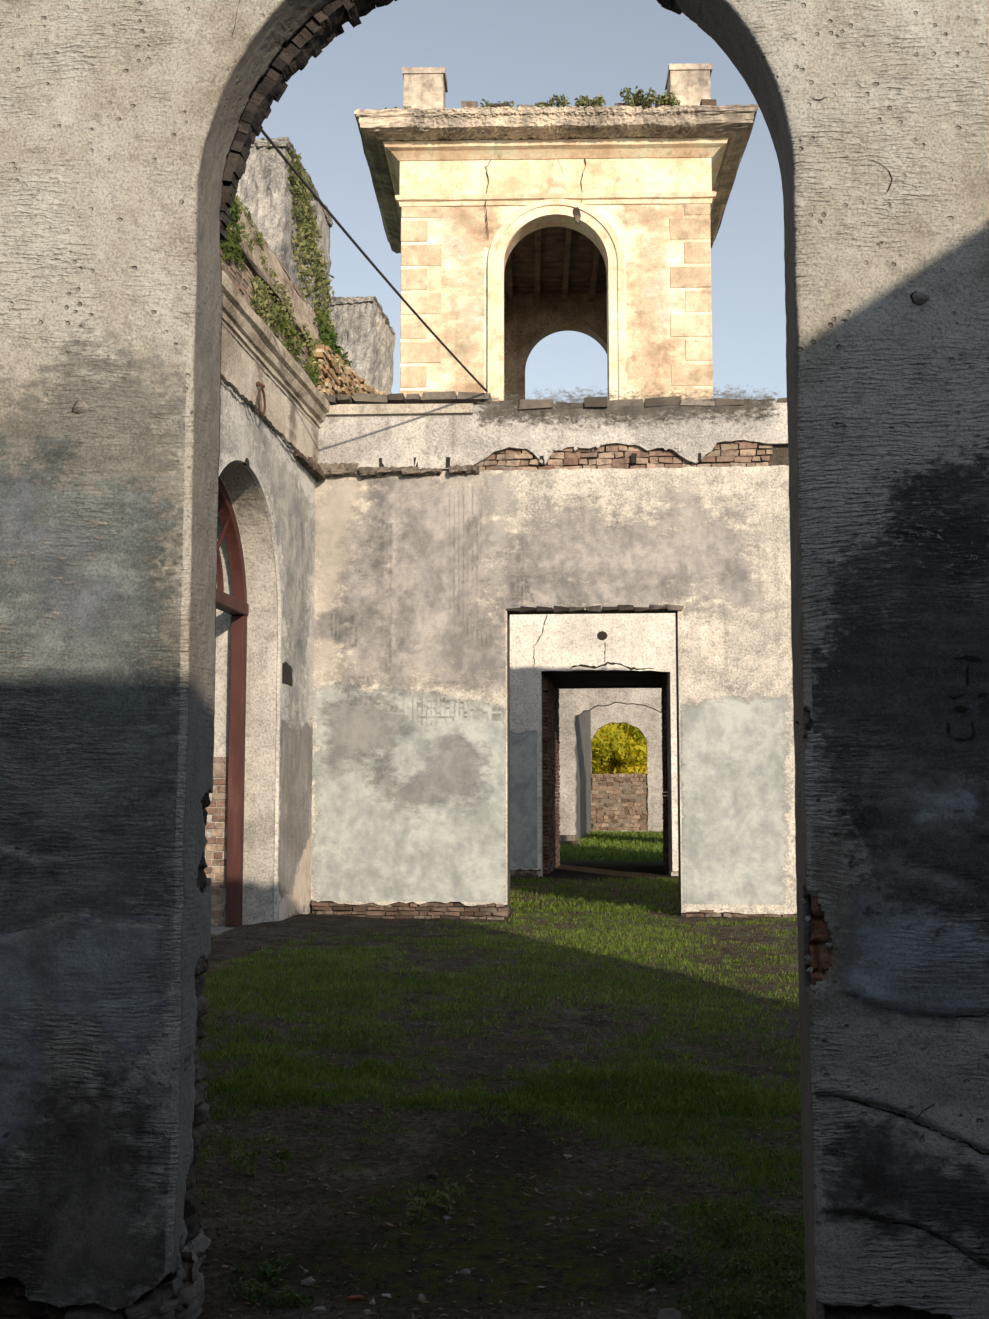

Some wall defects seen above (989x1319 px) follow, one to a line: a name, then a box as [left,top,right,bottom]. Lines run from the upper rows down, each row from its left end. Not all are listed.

spalling [657,0,708,35]
spalling [219,0,397,240]
spalling [293,439,773,480]
water stain [0,340,186,955]
water stain [252,421,772,808]
crack [570,643,655,670]
water stain [811,434,989,937]
spalling [190,757,228,925]
spalling [680,888,840,985]
crack [853,995,989,1018]
crack [827,1095,989,1155]
crack [835,1212,989,1268]